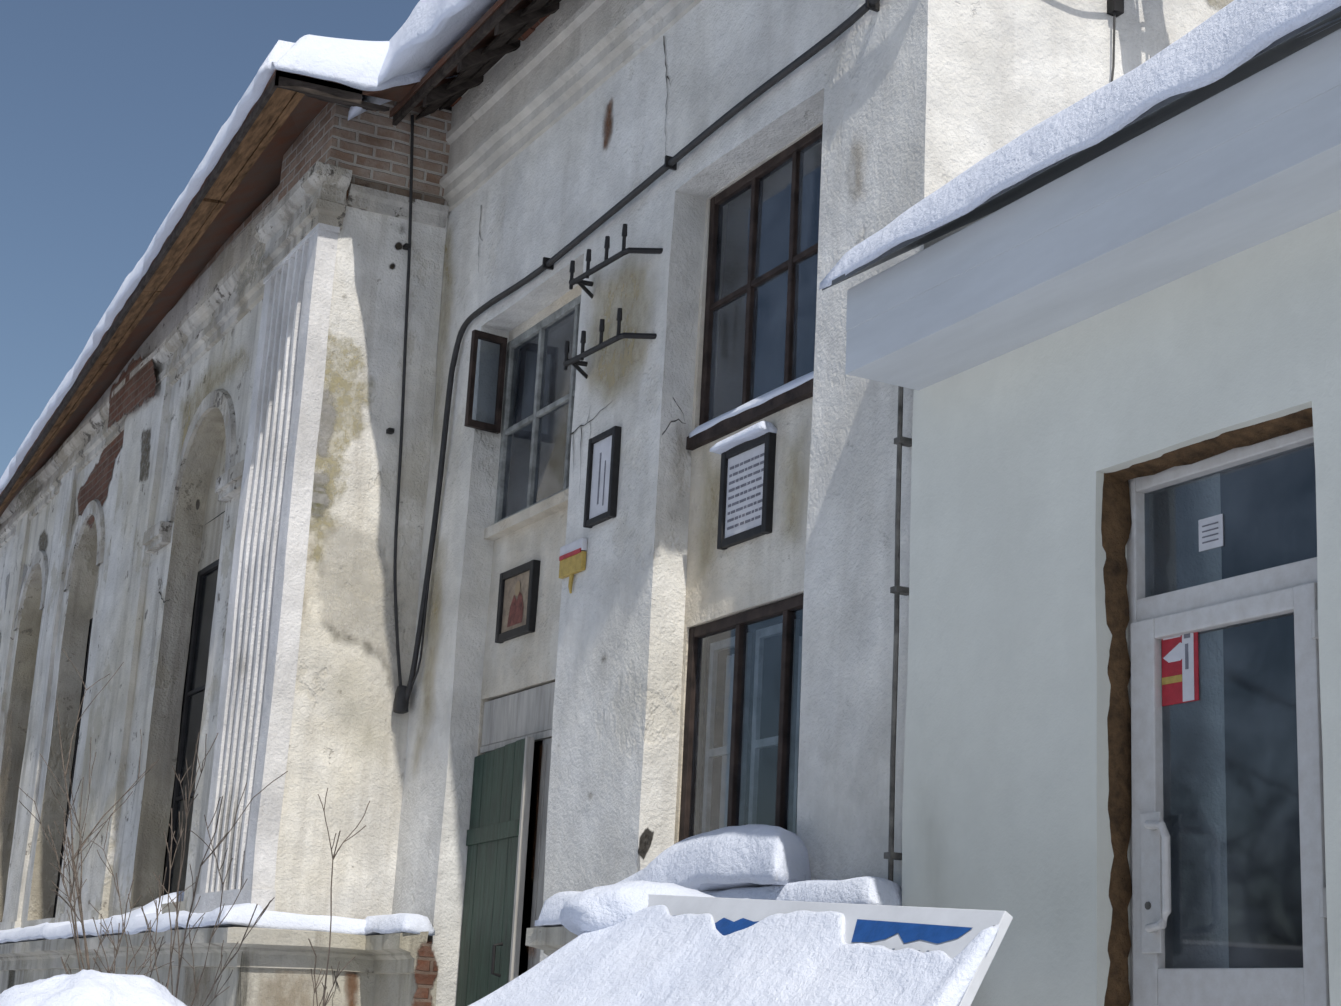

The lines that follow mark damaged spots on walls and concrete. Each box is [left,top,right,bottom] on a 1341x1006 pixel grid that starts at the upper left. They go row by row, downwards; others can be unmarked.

flaking render [1208,0,1234,8]
rust [603,99,612,148]
crack [663,36,671,156]
flaking render [77,355,156,529]
flaking render [412,942,438,1006]